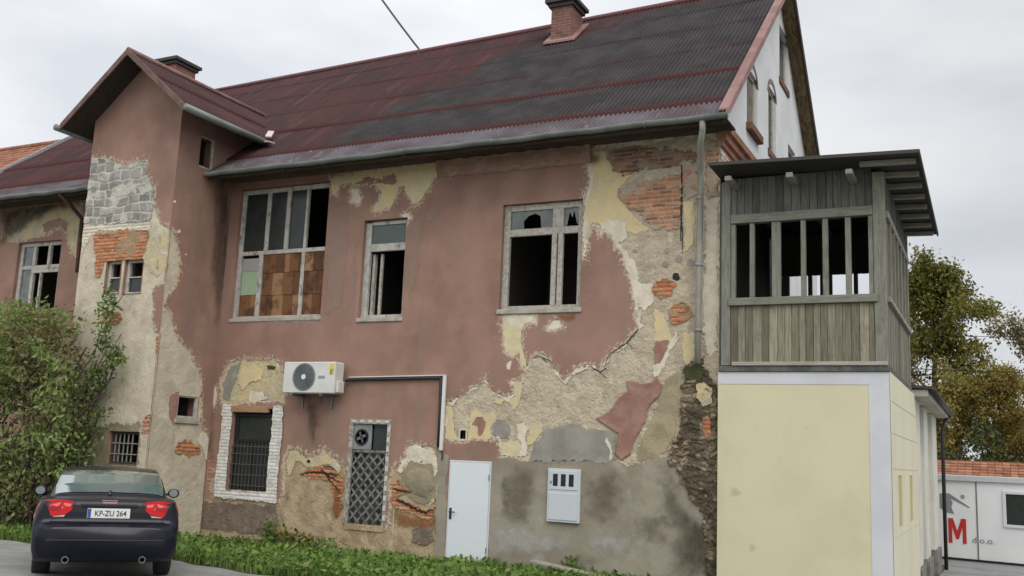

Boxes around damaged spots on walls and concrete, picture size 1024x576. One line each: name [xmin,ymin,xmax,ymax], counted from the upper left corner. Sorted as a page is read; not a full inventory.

peeling [4,157,439,560]
peeling [444,133,731,465]
crack [592,329,639,378]